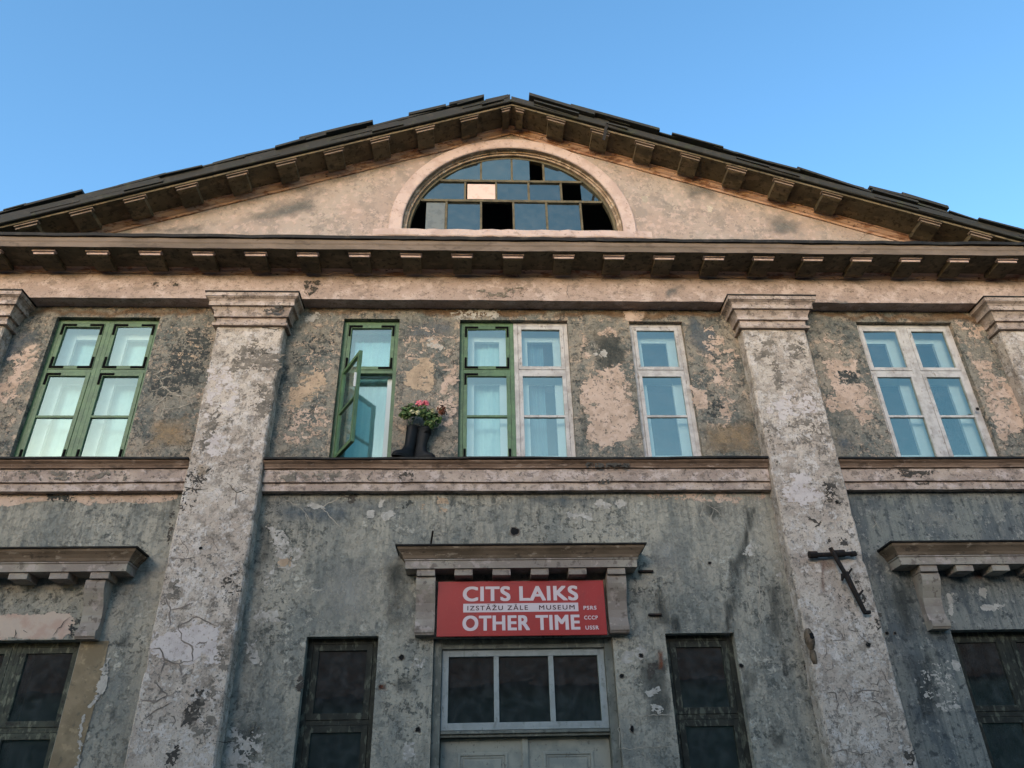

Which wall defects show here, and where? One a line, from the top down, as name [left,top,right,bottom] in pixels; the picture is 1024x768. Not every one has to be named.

peeling [0,312,335,544]
peeling [403,327,460,432]
peeling [579,327,638,449]
peeling [752,333,875,466]
peeling [971,357,1024,441]
flaking render [74,658,111,768]
crack [142,593,216,726]
flaking render [914,660,961,712]